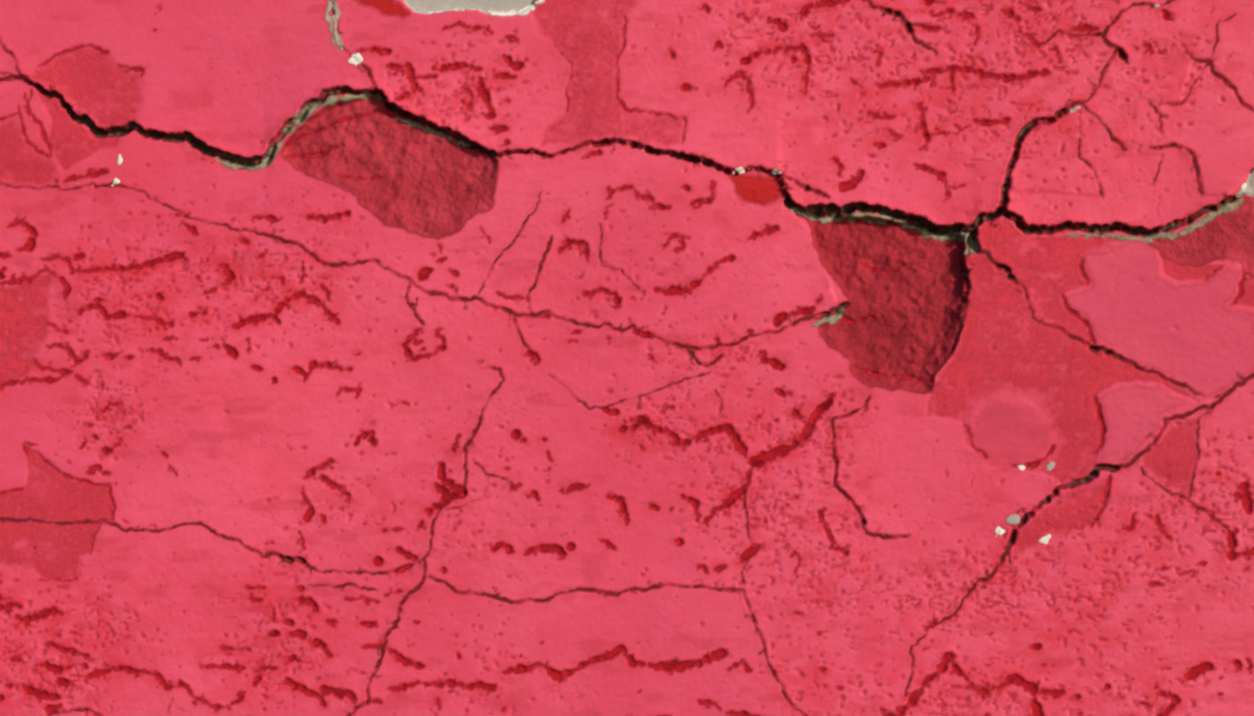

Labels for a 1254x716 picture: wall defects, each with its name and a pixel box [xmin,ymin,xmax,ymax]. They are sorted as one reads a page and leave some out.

spalling [280,87,499,240]
crack [0,367,792,716]
spalling [403,0,685,143]
crack [0,0,1253,370]
crack [406,203,849,409]
crack [831,396,908,539]
peeling [805,170,1254,550]
crack [905,373,1254,697]